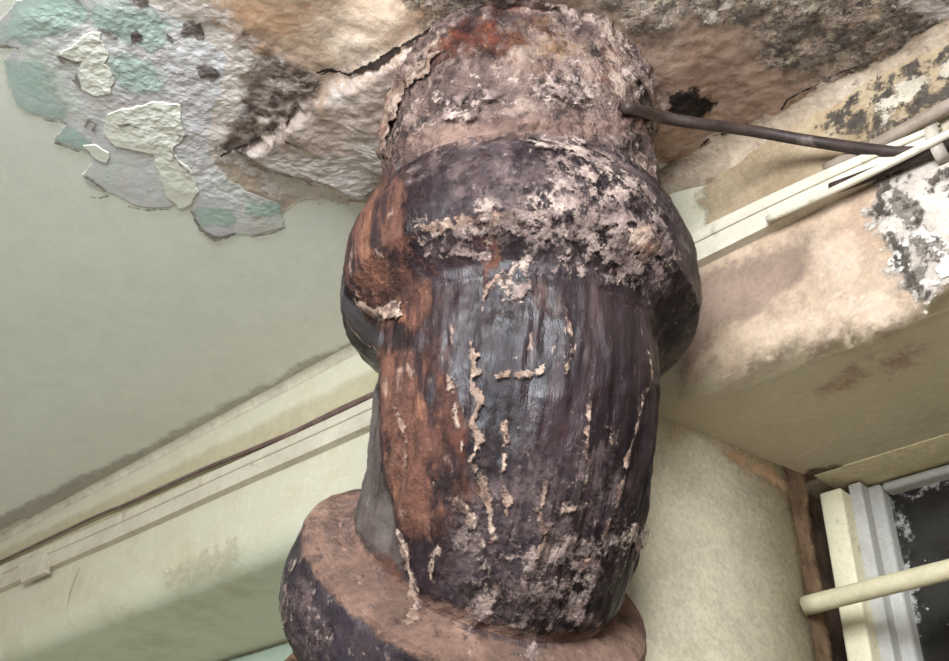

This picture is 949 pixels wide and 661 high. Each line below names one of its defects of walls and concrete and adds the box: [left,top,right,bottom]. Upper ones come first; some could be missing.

peeling [0,0,377,242]
crack [220,26,433,157]
water stain [353,298,403,322]
water stain [206,0,716,305]
rust [429,7,526,71]
spalling [424,0,562,27]
spalling [572,0,631,34]
water stain [554,0,949,224]
water stain [680,182,923,393]
peeling [860,151,949,314]
rust [343,169,481,630]